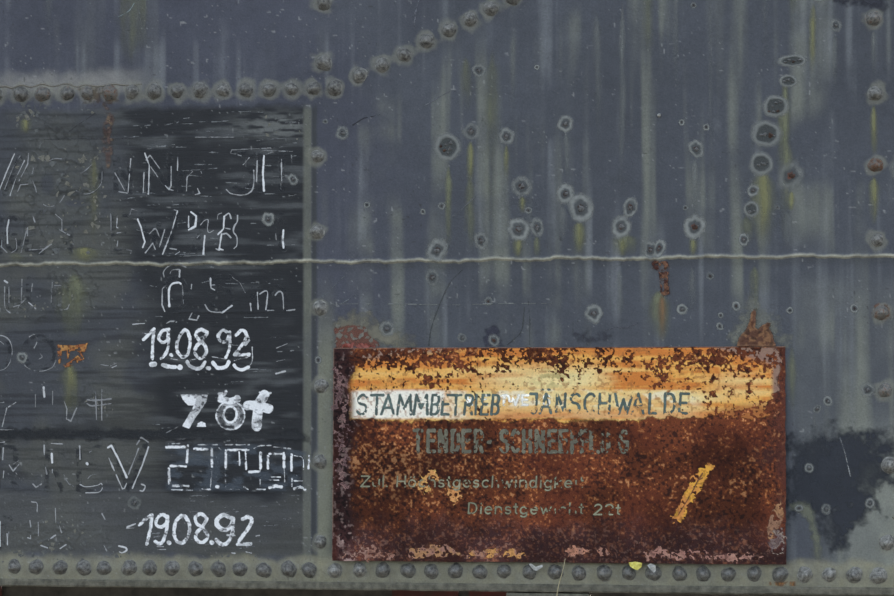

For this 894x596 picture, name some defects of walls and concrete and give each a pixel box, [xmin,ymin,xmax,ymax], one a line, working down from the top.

peeling [15,102,110,254]
corrosion [652,260,670,296]
corrosion [737,309,776,347]
corrosion [57,343,88,367]
leakage [786,430,894,558]